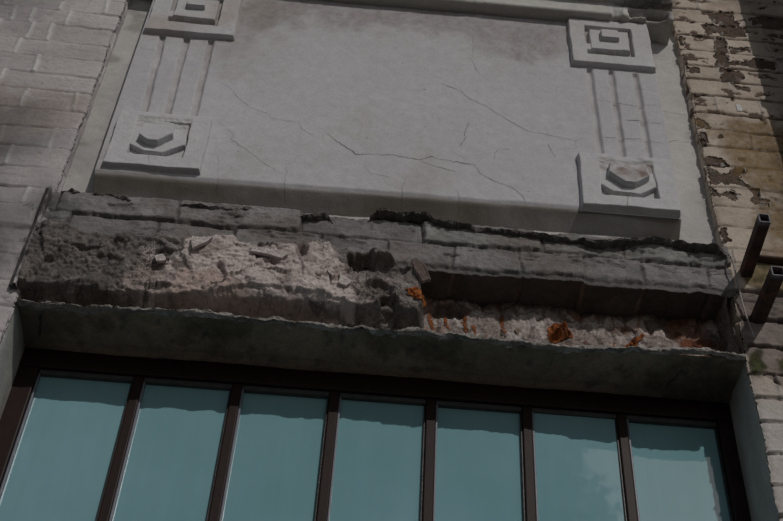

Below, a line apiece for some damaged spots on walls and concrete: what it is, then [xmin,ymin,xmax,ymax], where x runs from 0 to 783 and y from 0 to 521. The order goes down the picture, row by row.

peeling [701,10,783,92]
peeling [697,117,771,206]
spalling [24,219,356,325]
corrosion [405,286,450,329]
corrosion [547,321,573,343]